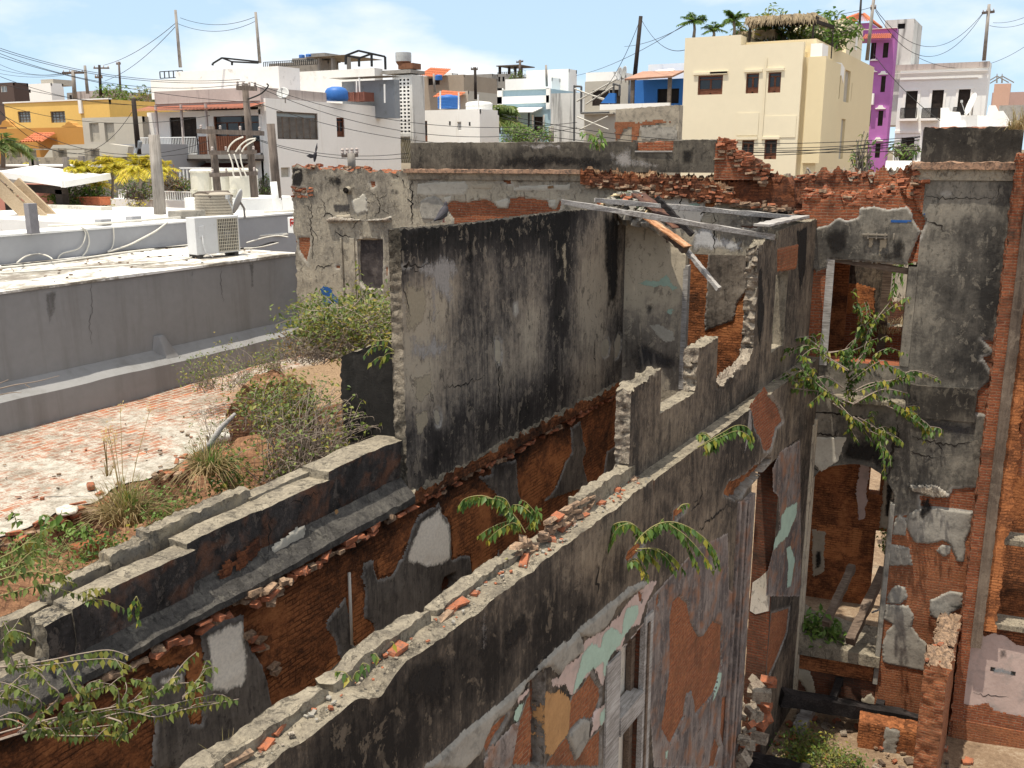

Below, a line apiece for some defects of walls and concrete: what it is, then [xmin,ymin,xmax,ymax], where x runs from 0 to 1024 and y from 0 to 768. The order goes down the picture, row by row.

spalling [296,237,310,259]
crack [308,175,414,269]
leakage [420,259,456,320]
spalling [448,197,561,224]
leakage [605,215,619,306]
spalling [920,488,975,510]
spalling [218,525,306,579]
spalling [232,577,294,609]
spalling [983,629,1024,646]
peeling [547,581,658,767]
spalling [661,597,726,766]
spalling [484,689,531,766]